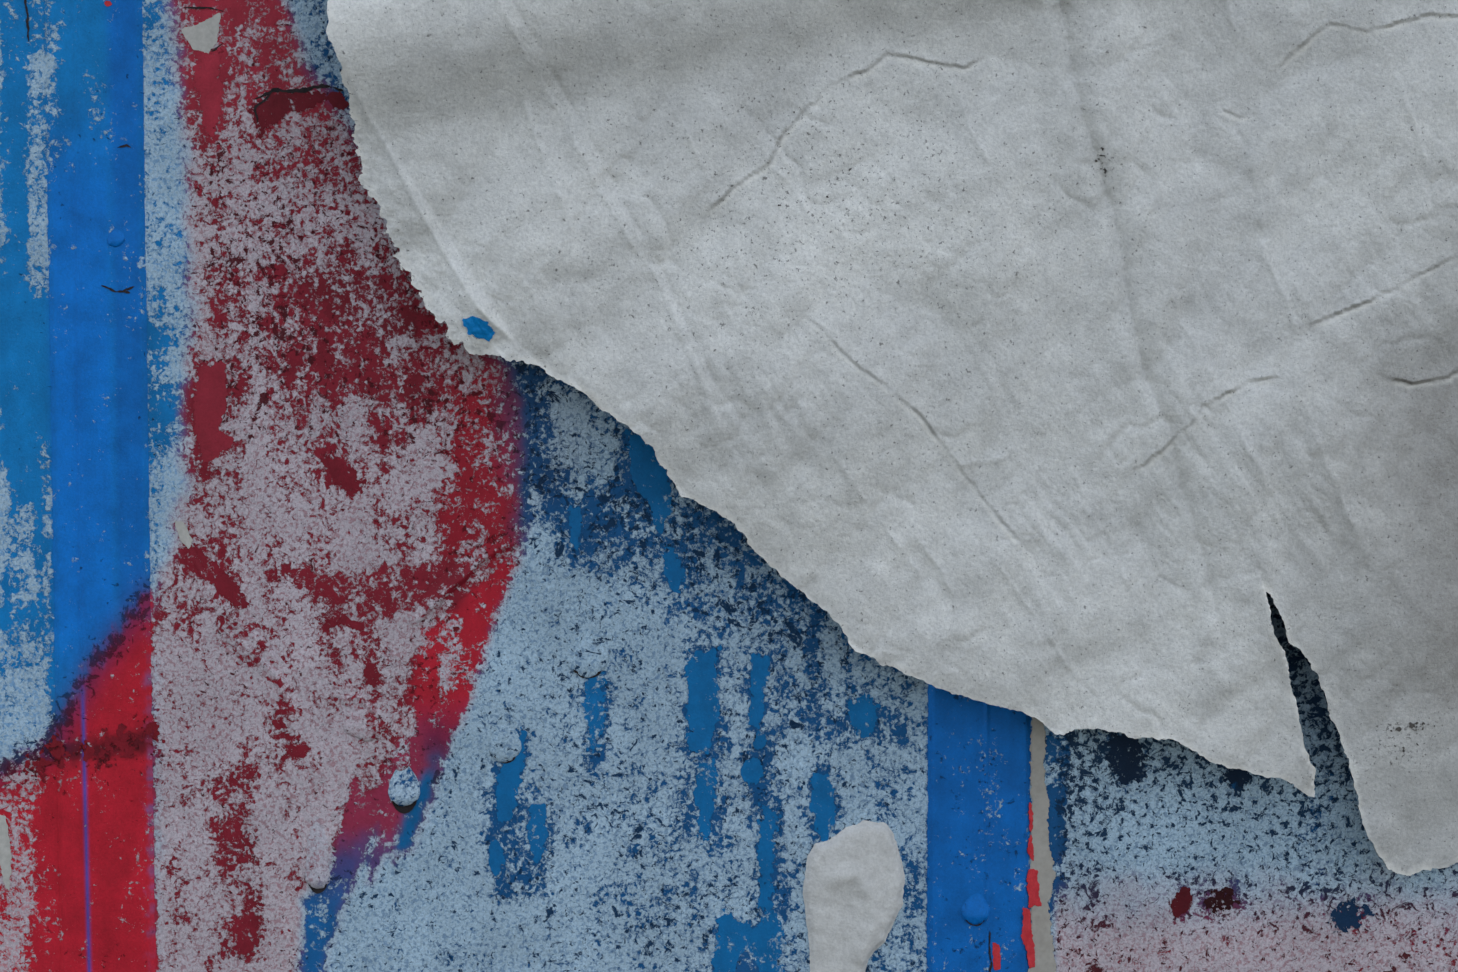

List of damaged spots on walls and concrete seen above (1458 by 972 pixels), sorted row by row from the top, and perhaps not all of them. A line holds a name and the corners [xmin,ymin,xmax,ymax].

peeling [288,233,433,408]
peeling [320,451,367,497]
peeling [625,429,687,594]
peeling [363,662,380,688]
peeling [488,727,549,877]
peeling [577,672,607,756]
peeling [684,644,722,845]
peeling [740,653,771,786]
peeling [809,772,836,842]
peeling [1105,732,1150,787]
peeling [1223,768,1252,791]
peeling [711,803,787,972]